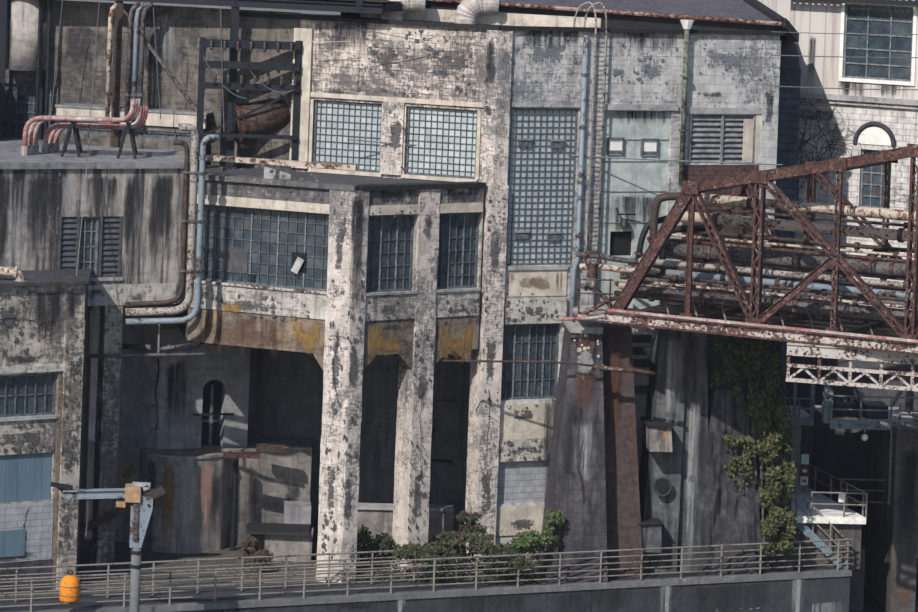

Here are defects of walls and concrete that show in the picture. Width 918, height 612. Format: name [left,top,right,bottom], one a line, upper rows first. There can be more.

peeling [354,26,495,149]
peeling [691,36,761,80]
damp [0,170,72,253]
damp [88,177,115,199]
damp [126,180,138,243]
damp [149,176,172,247]
peeling [207,166,321,204]
damp [7,292,78,362]
peeling [201,294,309,321]
crack [146,359,159,445]
peeling [321,197,559,565]